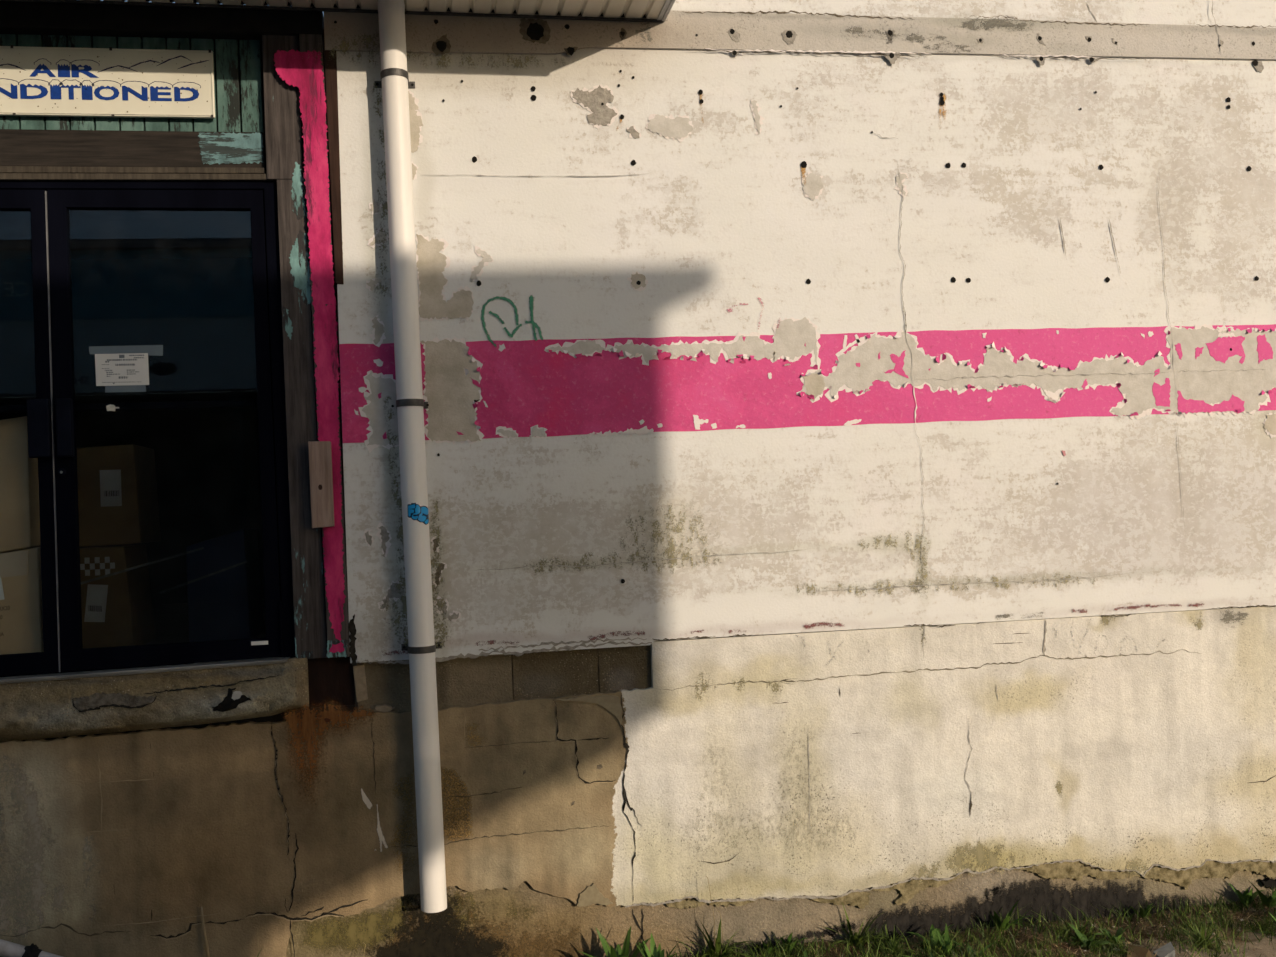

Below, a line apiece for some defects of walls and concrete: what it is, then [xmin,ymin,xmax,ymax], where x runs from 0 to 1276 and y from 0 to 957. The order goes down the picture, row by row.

peeling [570,84,693,142]
peeling [415,234,494,321]
peeling [627,271,648,292]
peeling [354,315,399,453]
peeling [420,337,548,444]
peeling [544,317,1276,438]
crack [144,670,296,694]
crack [655,627,1202,690]
crack [964,723,973,819]
crack [2,724,368,957]
crack [393,695,645,949]
water stain [367,888,587,957]